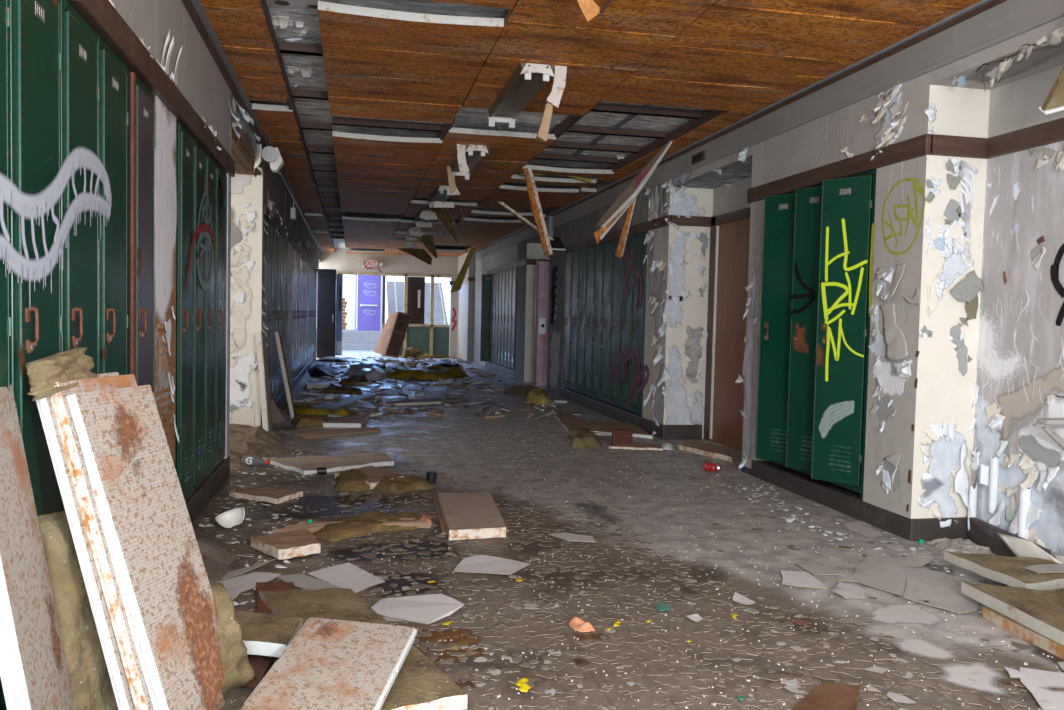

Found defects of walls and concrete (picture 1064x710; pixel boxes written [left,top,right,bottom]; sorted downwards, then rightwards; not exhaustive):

flaking render [203,97,315,276]
peeling [544,101,702,159]
peeling [871,84,908,160]
peeling [924,103,938,134]
peeling [154,96,179,459]
peeling [230,352,262,417]
peeling [643,148,752,451]
peeling [735,261,757,469]
peeling [868,158,1064,564]